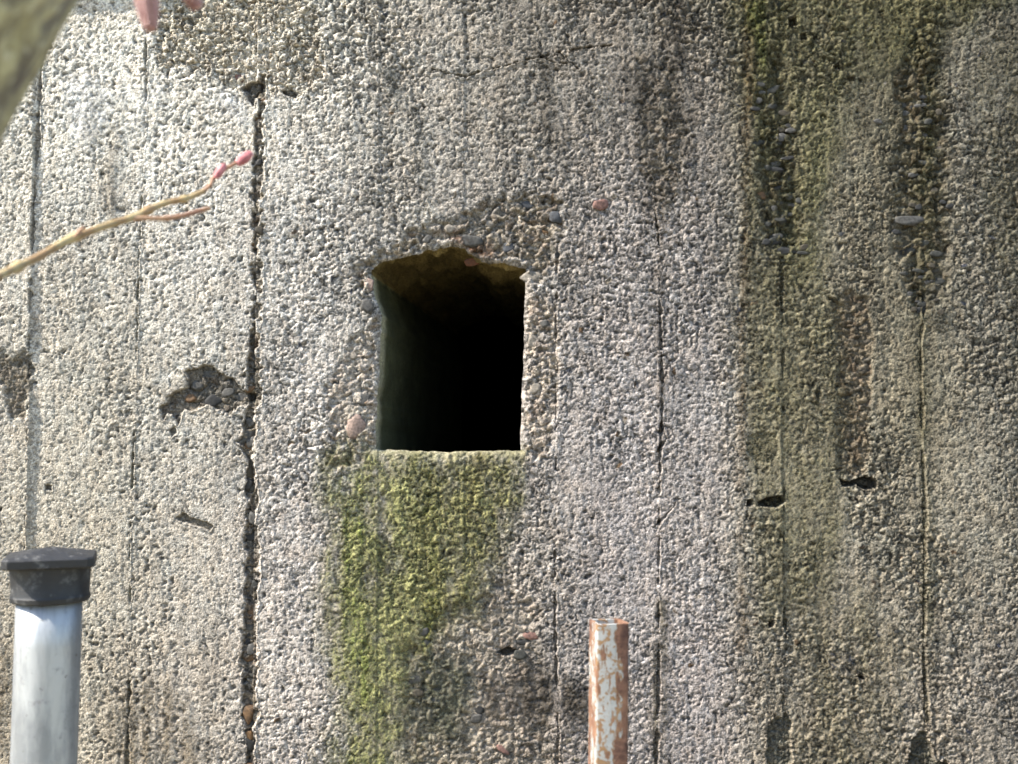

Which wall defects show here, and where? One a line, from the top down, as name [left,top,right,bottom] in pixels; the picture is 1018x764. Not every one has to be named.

crack [430,42,615,80]
spalling [158,362,255,492]